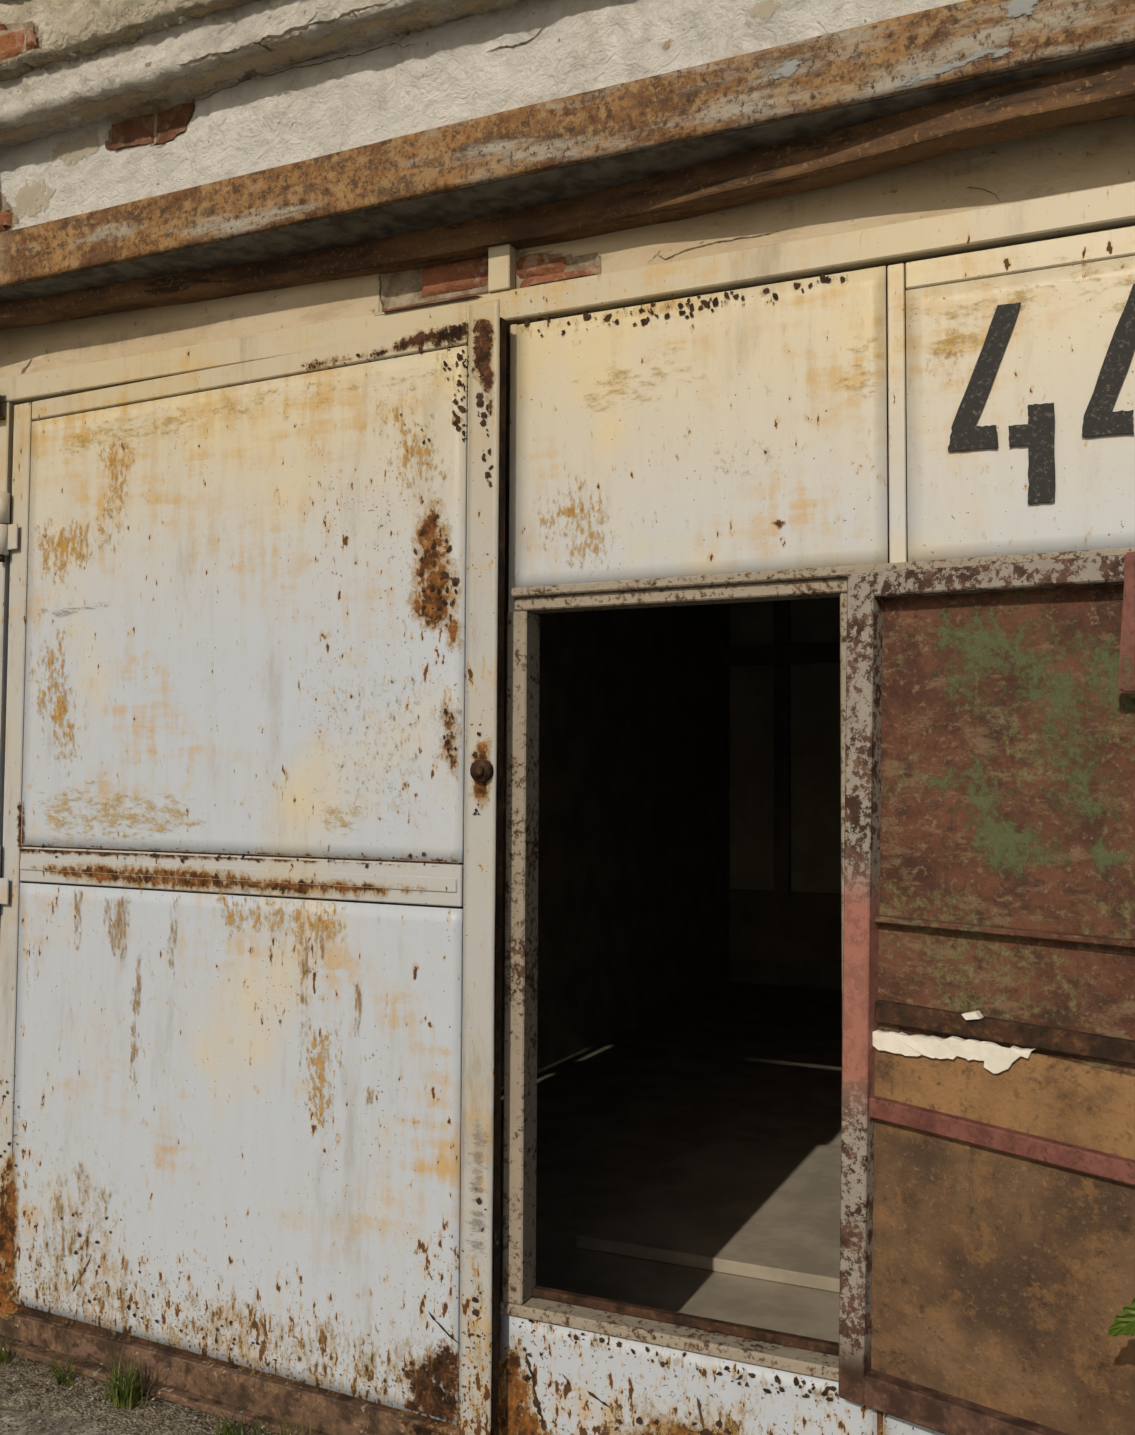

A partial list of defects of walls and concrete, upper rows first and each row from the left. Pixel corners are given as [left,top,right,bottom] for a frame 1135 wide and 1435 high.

spalling [0,21,42,82]
crack [176,0,432,104]
crack [487,25,545,52]
spalling [52,98,196,166]
spalling [374,255,489,316]
spalling [511,249,601,290]
rust [377,406,461,647]
rust [441,705,490,772]
rust [17,781,458,1128]
rust [0,1135,163,1329]
rust [173,1286,549,1435]
rust [608,1404,743,1435]